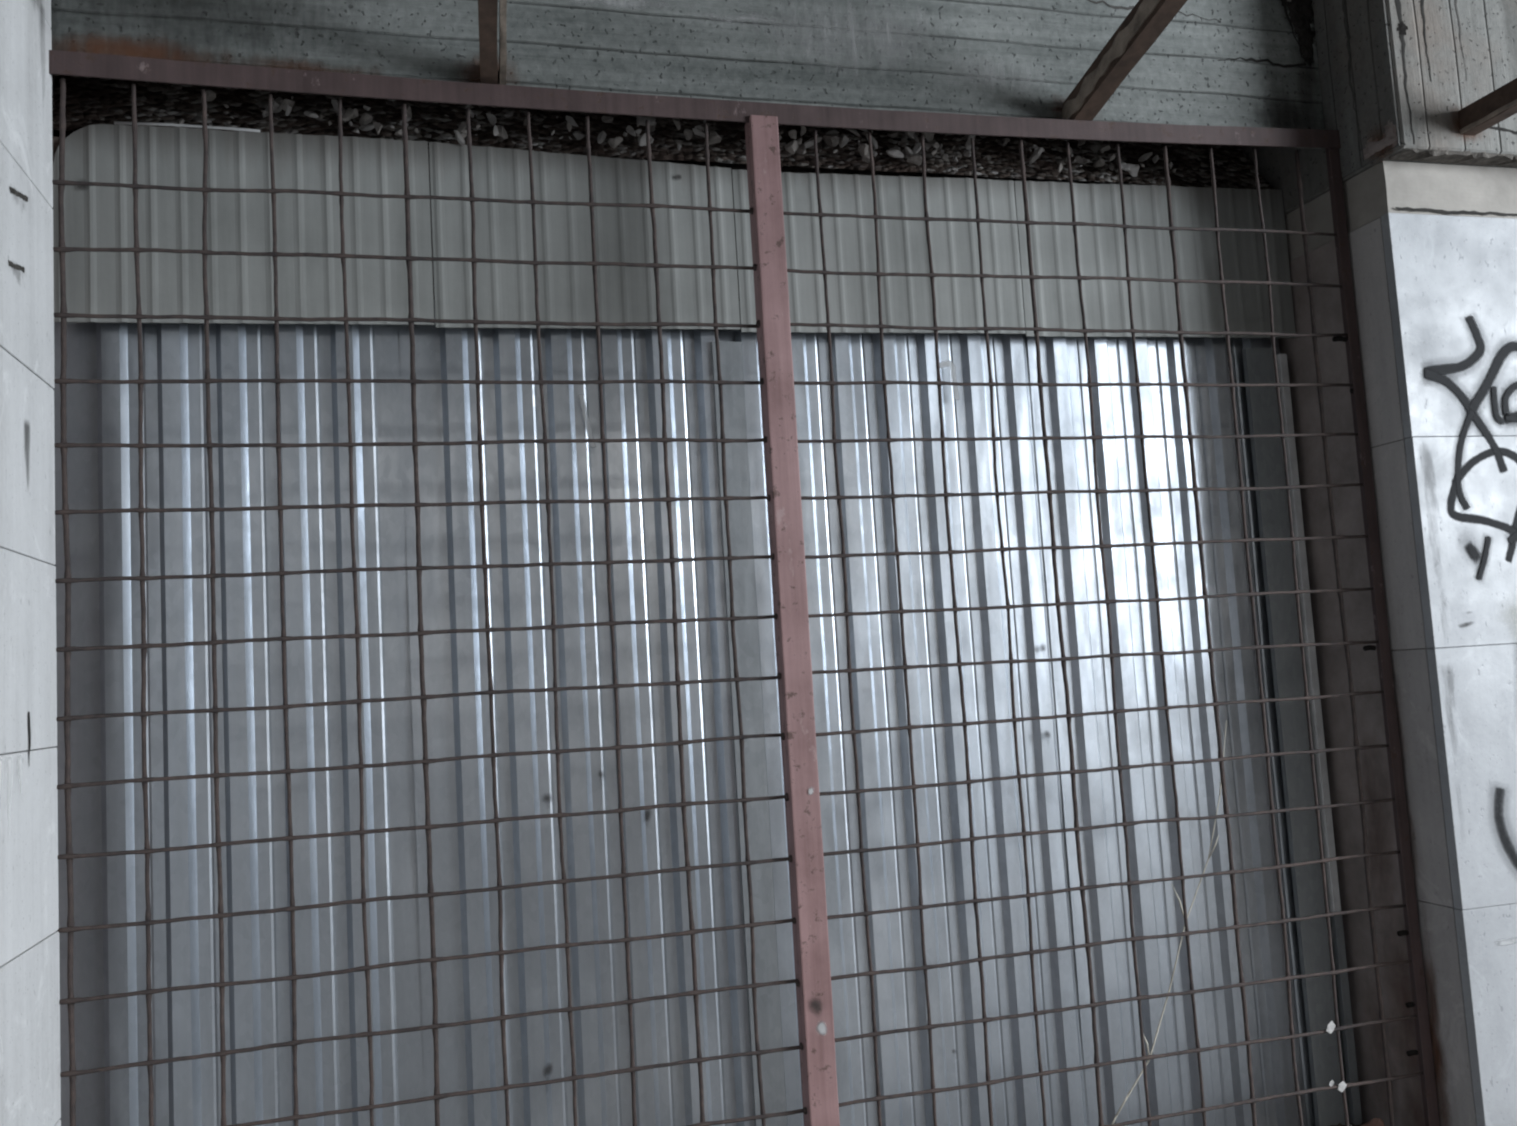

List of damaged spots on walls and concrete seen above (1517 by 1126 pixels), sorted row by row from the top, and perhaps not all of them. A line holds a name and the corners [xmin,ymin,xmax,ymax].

spalling [1218,0,1315,68]
crack [1342,0,1364,161]
crack [1395,0,1467,145]
spalling [1363,119,1517,167]
crack [1490,127,1517,135]
crack [1395,207,1517,216]